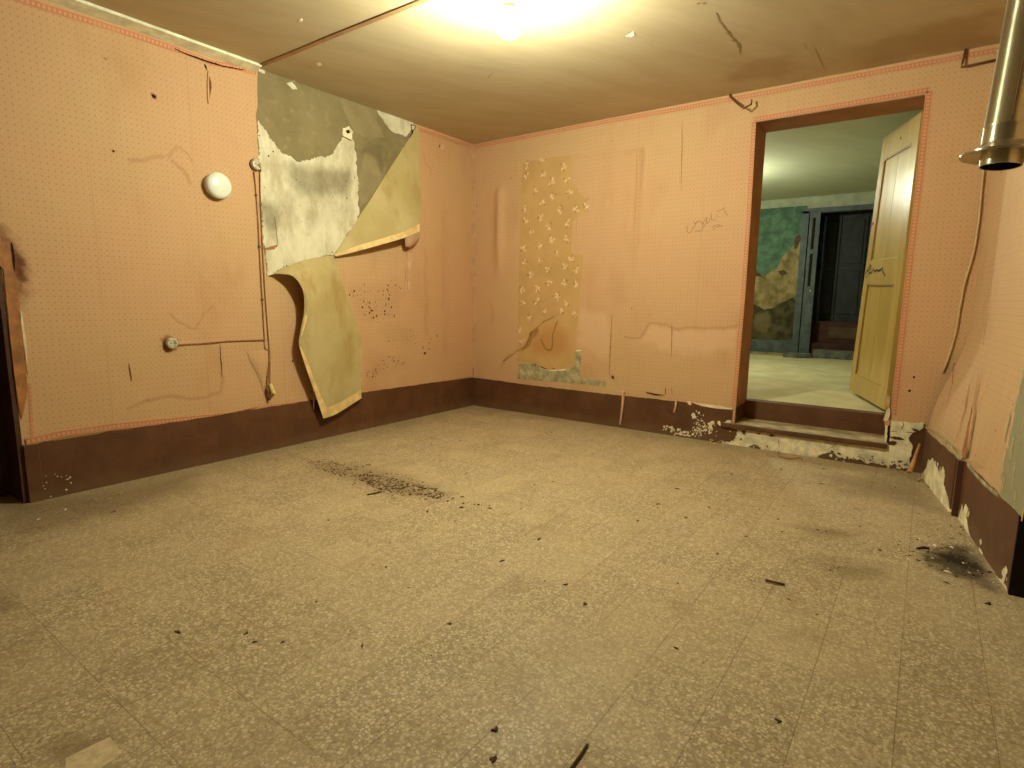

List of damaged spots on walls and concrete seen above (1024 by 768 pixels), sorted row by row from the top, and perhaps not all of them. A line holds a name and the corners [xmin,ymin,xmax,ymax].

flaking render [256,69,416,277]
flaking render [518,350,606,387]
peeling [663,403,775,449]
flaking render [818,362,1024,521]
peeling [921,458,983,555]